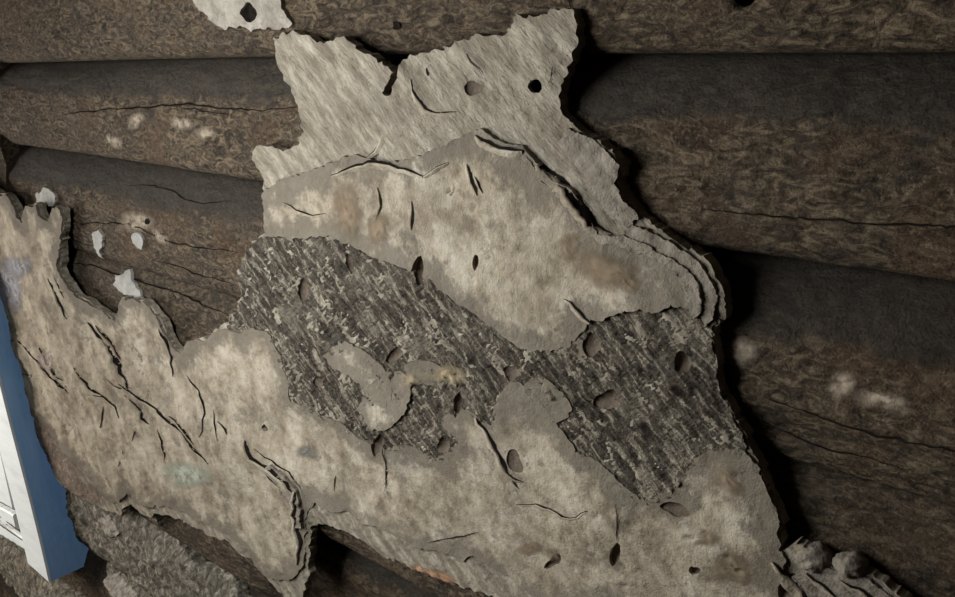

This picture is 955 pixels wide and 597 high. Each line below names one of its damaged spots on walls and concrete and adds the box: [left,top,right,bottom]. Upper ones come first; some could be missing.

crack [409,68,455,117]
crack [330,135,611,235]
crack [283,202,326,218]
spalling [92,229,105,259]
spalling [131,232,145,250]
crack [563,299,590,325]
crack [10,221,302,565]
spalling [455,392,463,413]
spalling [594,389,620,409]
flaking render [713,429,730,445]
spalling [612,543,620,564]
peeling [103,572,139,597]